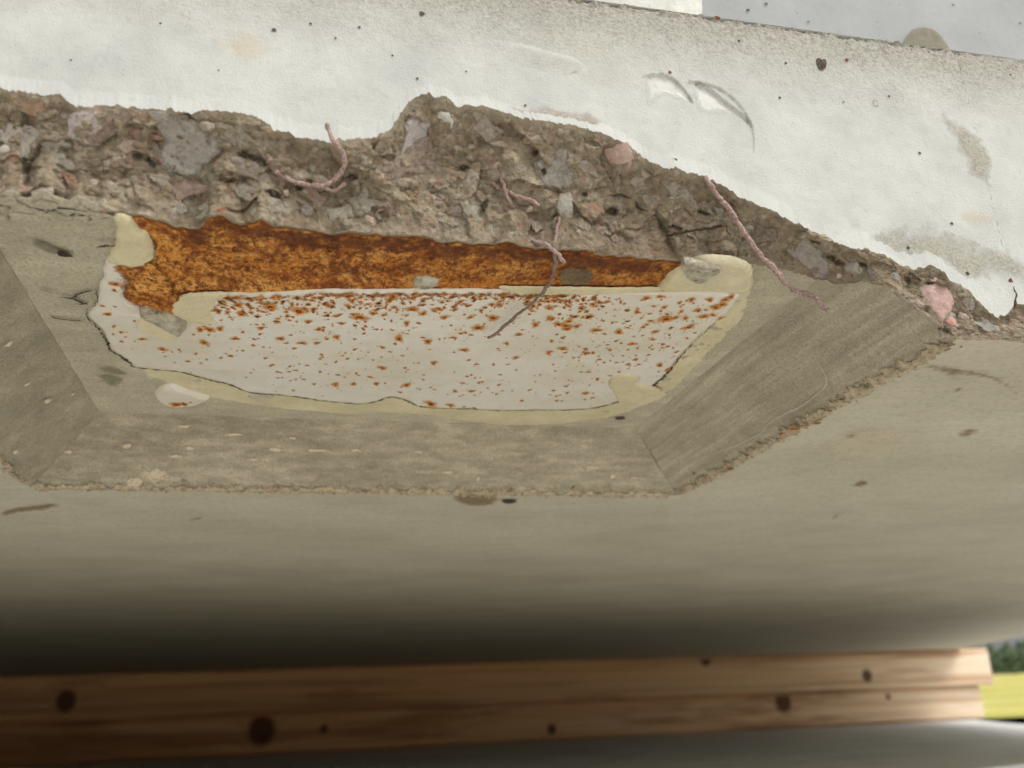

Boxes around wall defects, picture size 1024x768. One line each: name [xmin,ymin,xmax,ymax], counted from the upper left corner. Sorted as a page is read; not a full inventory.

spalling [647,77,753,128]
rust [99,217,735,409]
spalling [0,87,1024,506]